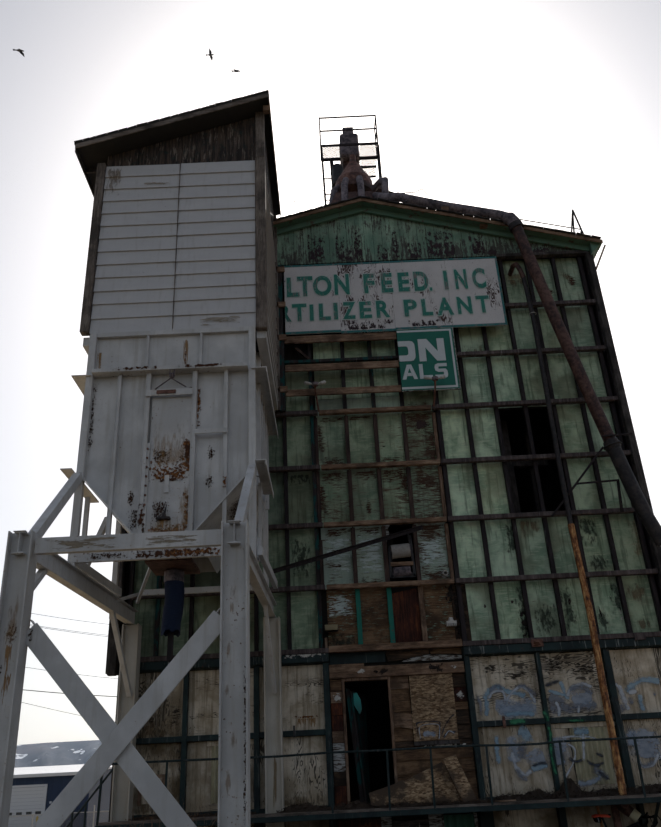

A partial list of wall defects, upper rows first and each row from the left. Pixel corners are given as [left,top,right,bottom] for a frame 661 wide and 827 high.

peeling [377,230,455,260]
rust [179,340,222,367]
rust [149,437,190,483]
rust [126,487,189,532]
rust [89,547,221,559]
peeling [329,595,351,617]